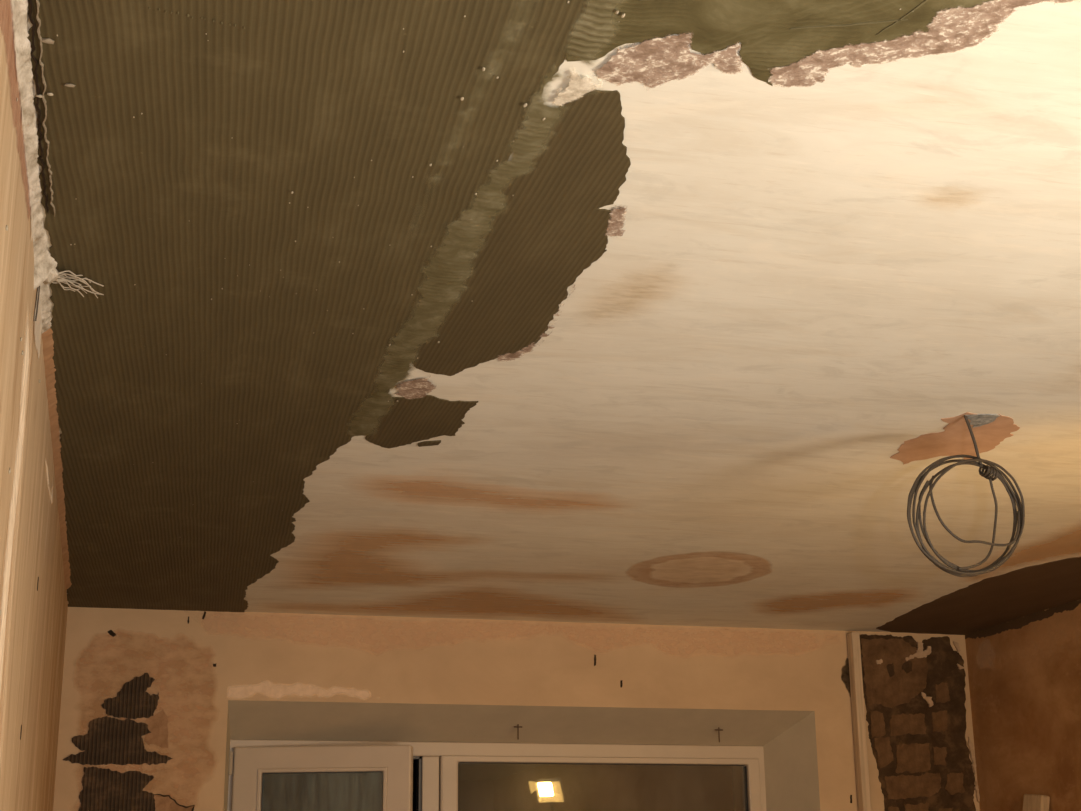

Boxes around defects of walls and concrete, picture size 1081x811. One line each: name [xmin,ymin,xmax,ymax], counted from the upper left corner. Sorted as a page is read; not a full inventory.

flaking render [15,0,1073,612]
water stain [1001,531,1081,566]
flaking render [63,632,214,811]
flaking render [860,557,1081,811]